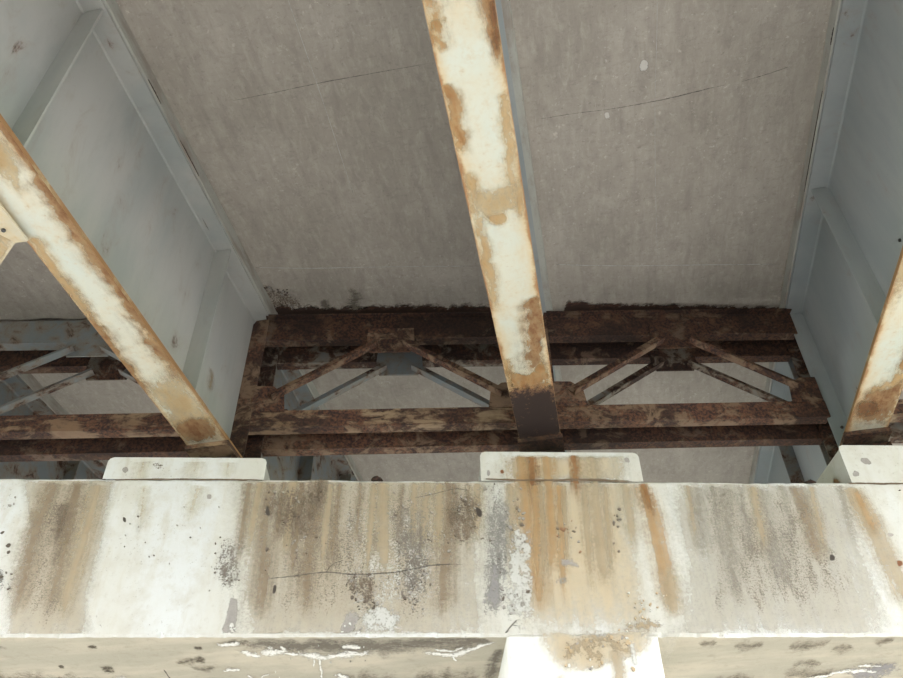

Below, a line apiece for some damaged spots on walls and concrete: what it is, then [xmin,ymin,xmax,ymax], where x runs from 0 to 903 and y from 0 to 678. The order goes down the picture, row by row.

rust [480,0,502,59]
rust [442,84,469,150]
rust [466,94,523,302]
rust [0,121,217,442]
rust [895,258,903,293]
rust [503,297,560,439]
rust [855,359,903,424]
damp [9,481,113,634]
damp [217,480,502,678]
crack [270,560,459,587]
rust [506,455,678,678]
damp [679,484,880,645]